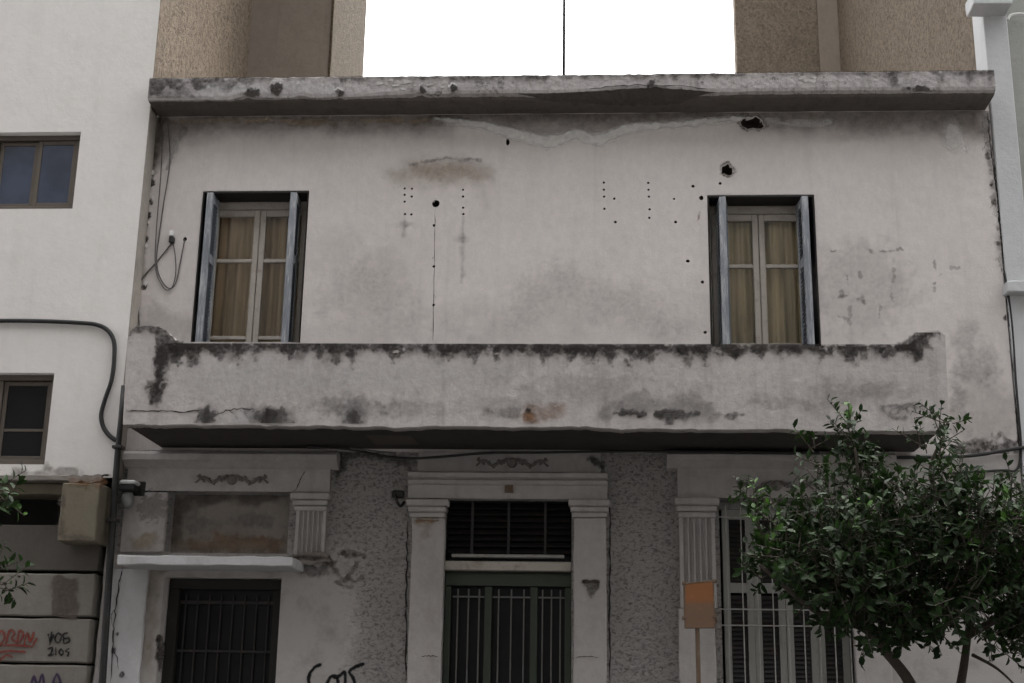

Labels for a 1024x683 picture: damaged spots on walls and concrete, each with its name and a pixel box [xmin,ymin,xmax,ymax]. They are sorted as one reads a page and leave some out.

spalling [244,80,283,97]
damp [129,326,941,405]
crack [129,408,254,420]
damp [198,405,219,423]
damp [251,406,287,423]
damp [347,409,363,424]
spalling [290,551,364,584]
spalling [582,579,600,596]